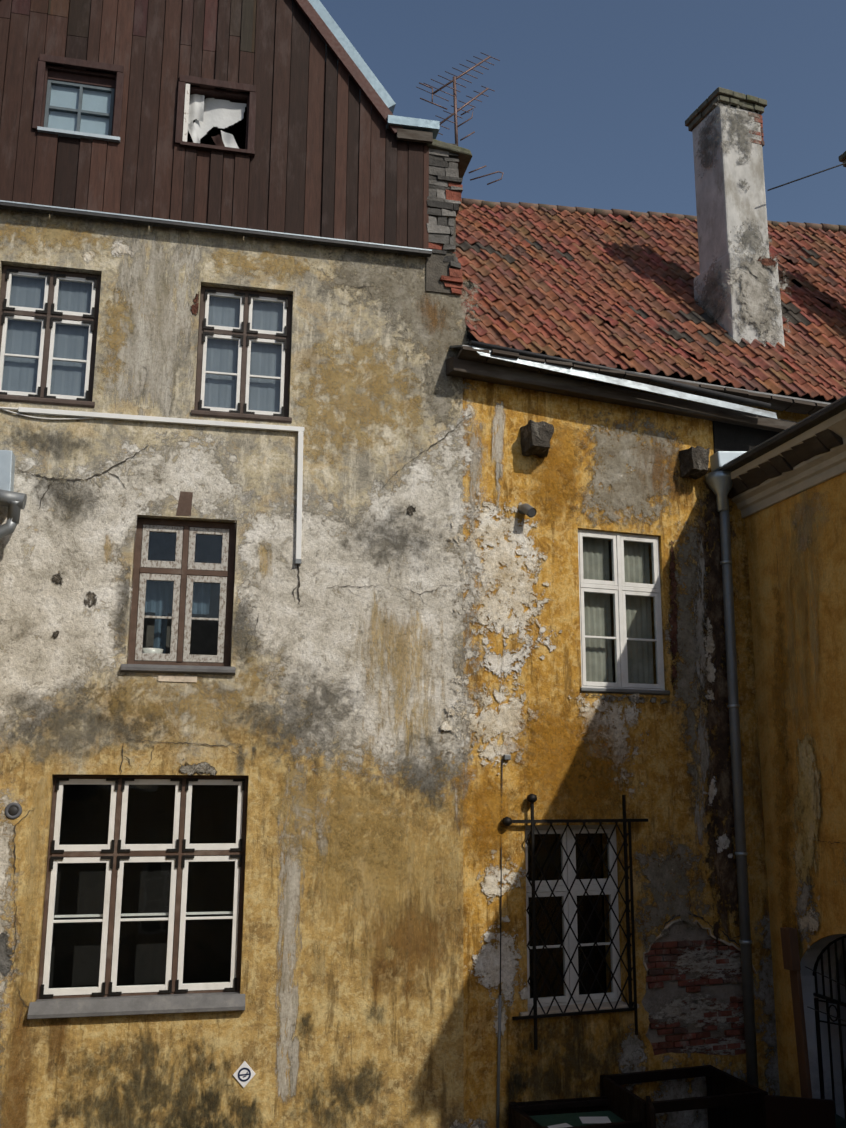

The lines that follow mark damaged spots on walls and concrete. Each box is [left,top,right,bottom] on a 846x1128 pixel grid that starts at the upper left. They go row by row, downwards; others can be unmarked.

crack [15,446,147,510]
peeling [0,246,562,818]
damp [694,471,755,955]
peeling [0,789,22,950]
mould [50,1042,256,1128]
peeling [465,850,528,1036]
spalling [617,918,757,1092]
peeling [792,728,823,949]